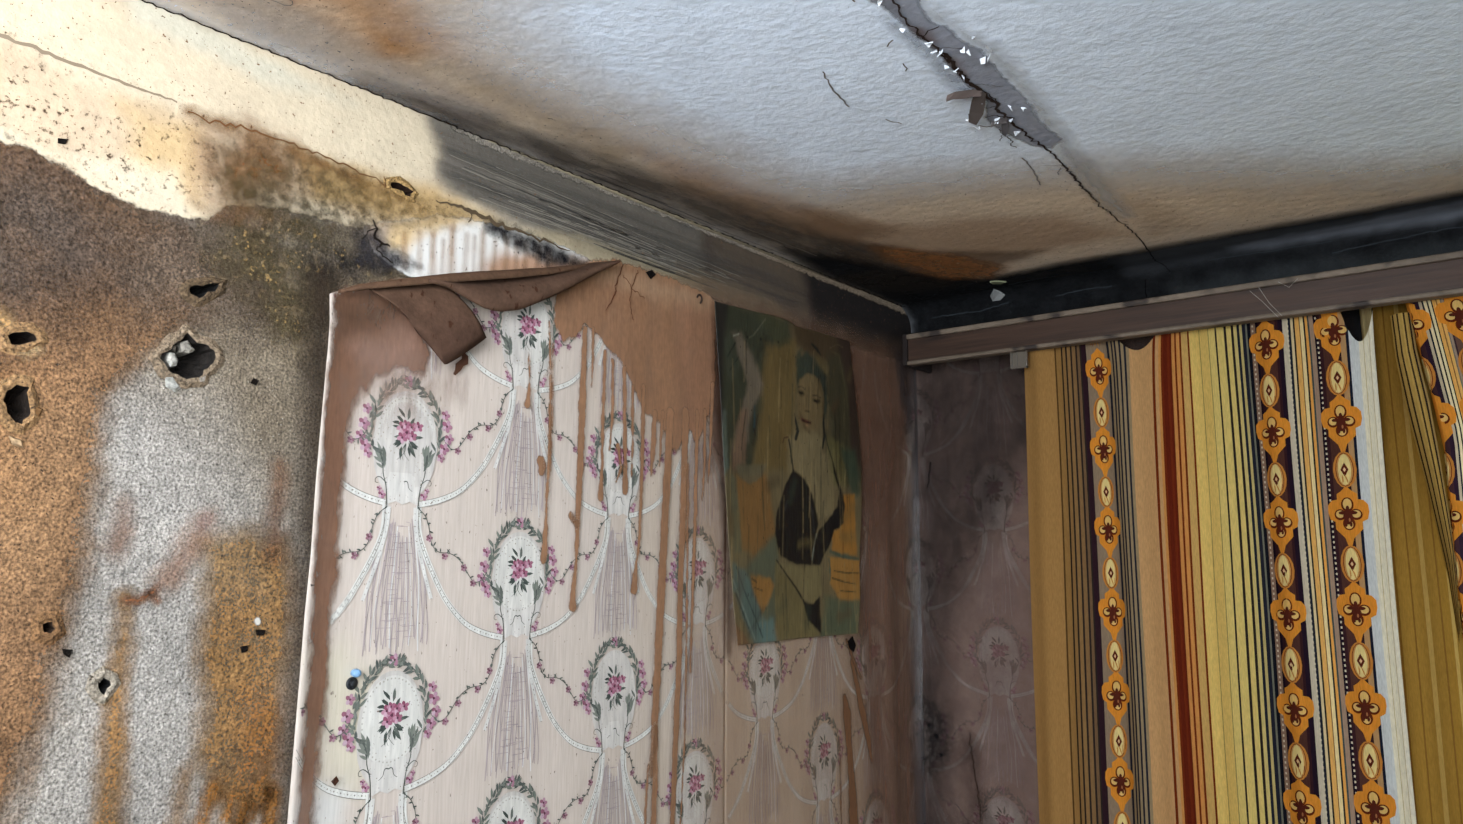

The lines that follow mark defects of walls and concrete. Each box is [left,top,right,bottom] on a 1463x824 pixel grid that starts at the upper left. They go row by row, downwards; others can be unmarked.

peeling [0,0,911,359]
damp [152,0,1463,334]
crack [887,0,1170,297]
spalling [0,374,43,448]
spalling [43,622,55,633]
spalling [98,678,111,695]
rust [94,585,160,824]
spalling [148,324,225,392]
damp [0,66,445,824]
rust [176,534,291,824]
spalling [240,617,266,653]
damp [449,154,744,824]